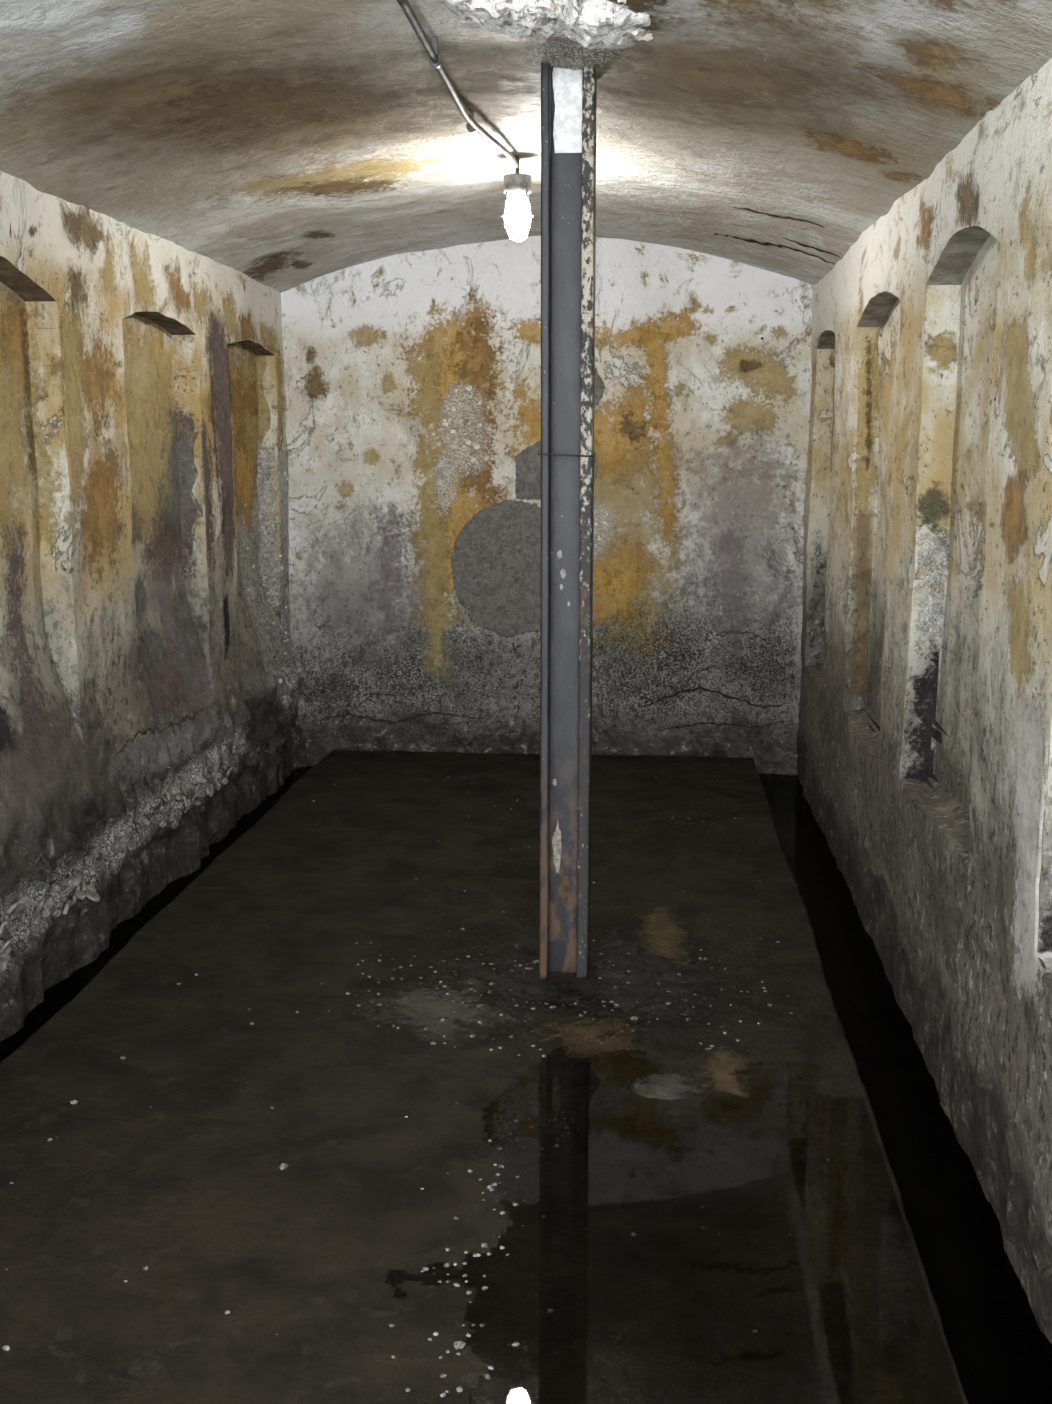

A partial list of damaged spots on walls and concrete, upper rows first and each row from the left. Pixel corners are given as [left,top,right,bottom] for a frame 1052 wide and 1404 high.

flaking render [441,0,681,71]
water stain [598,21,889,122]
water stain [0,515,122,847]
water stain [136,585,213,725]
water stain [235,444,541,754]
water stain [592,594,801,752]
peeling [0,706,254,981]